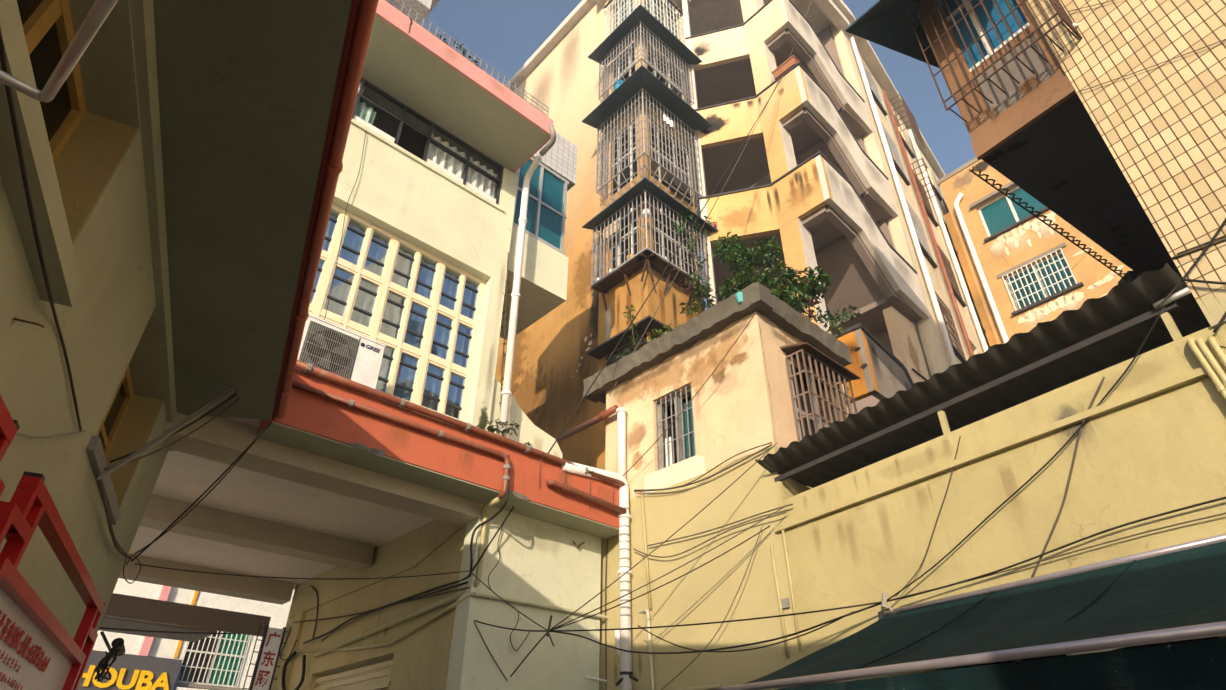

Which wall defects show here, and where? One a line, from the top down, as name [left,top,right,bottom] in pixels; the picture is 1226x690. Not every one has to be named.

peeling [990,211,1056,255]
peeling [1017,265,1124,324]